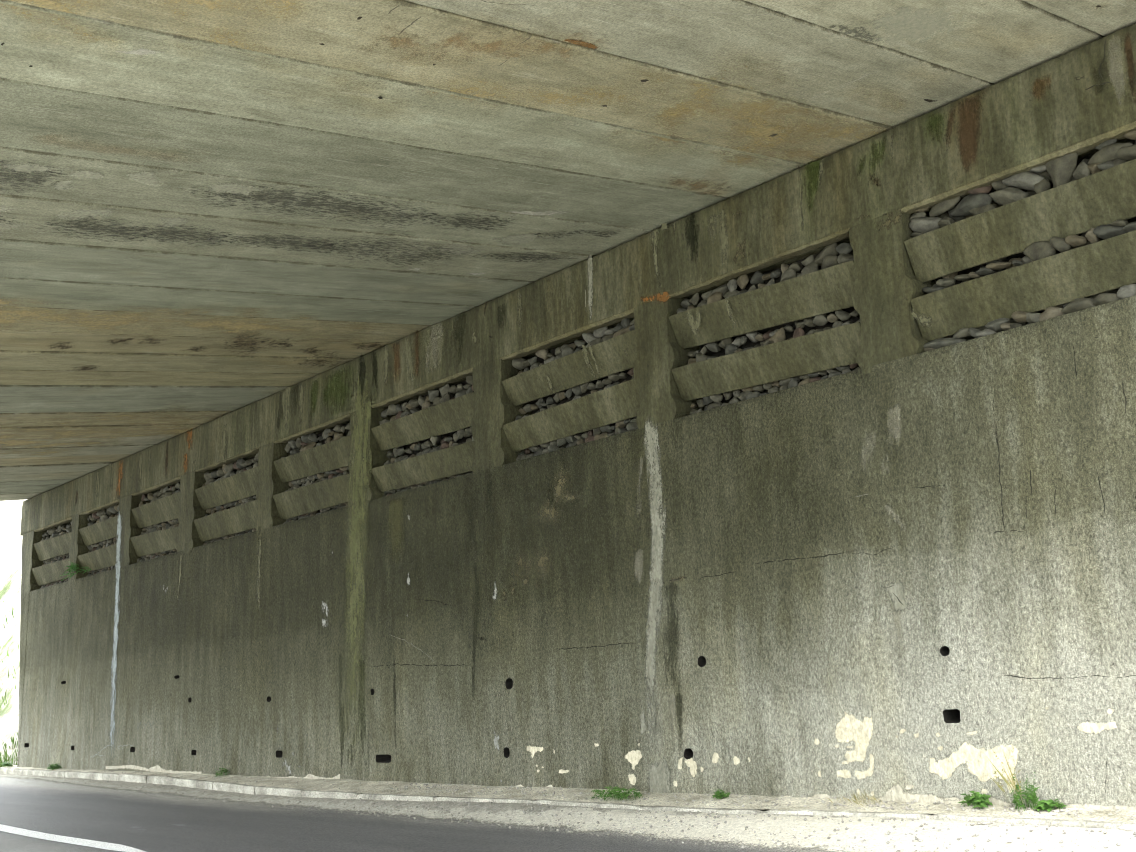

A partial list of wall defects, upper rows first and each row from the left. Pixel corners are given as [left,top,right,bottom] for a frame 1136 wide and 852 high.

rust [1124,35,1134,91]
rust [946,93,984,172]
damp [41,185,593,319]
crack [992,389,1057,533]
damp [340,344,389,761]
damp [640,419,682,739]
damp [105,511,202,774]
crack [1004,673,1136,681]
flaking render [625,743,642,785]
flaking render [673,753,751,787]
flaking render [835,712,874,796]
flaking render [928,731,1019,794]